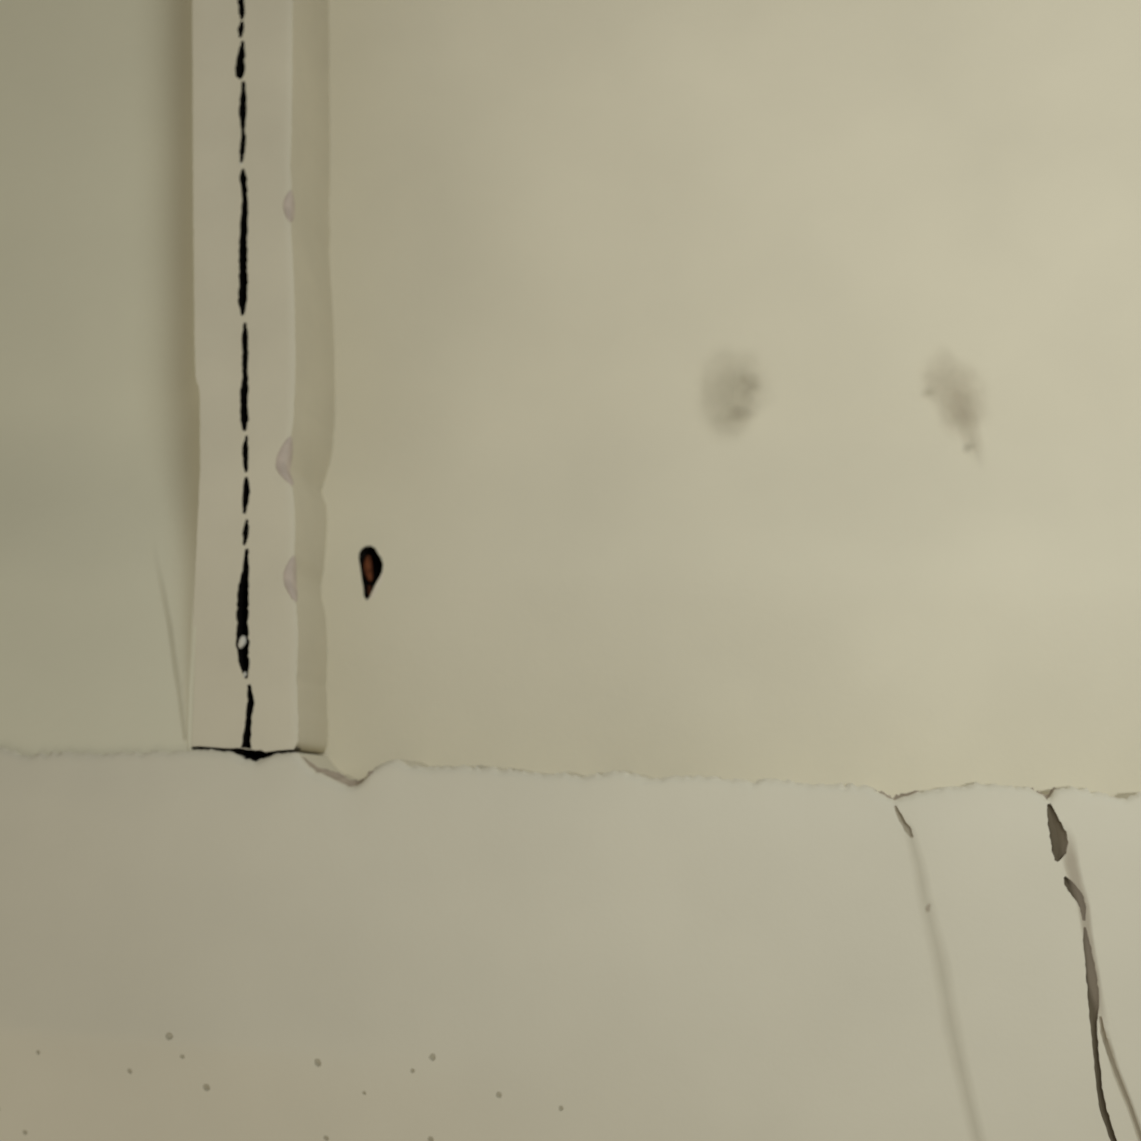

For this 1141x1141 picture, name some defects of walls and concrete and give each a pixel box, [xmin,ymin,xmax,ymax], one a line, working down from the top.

crack [235,0,255,749]
crack [894,806,913,838]
crack [1047,804,1141,1141]